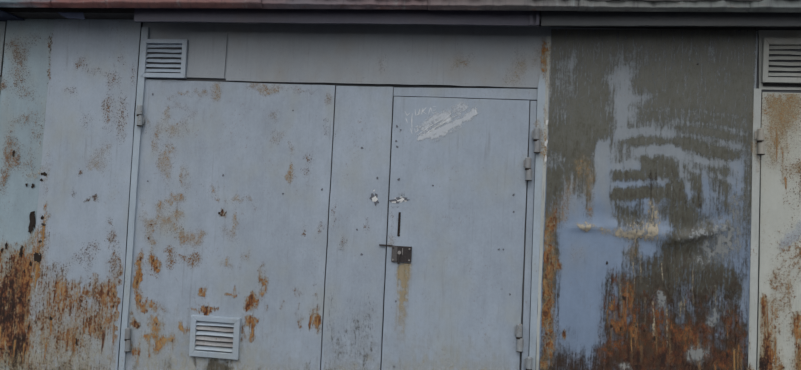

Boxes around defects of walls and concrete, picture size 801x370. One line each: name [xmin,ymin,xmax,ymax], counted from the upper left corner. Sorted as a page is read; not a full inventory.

corrosion [0,114,47,195]
corrosion [751,93,801,206]
corrosion [0,204,123,370]
corrosion [130,194,206,362]
corrosion [191,288,219,316]
corrosion [226,265,268,343]
corrosion [540,160,595,368]
corrosion [588,217,801,370]